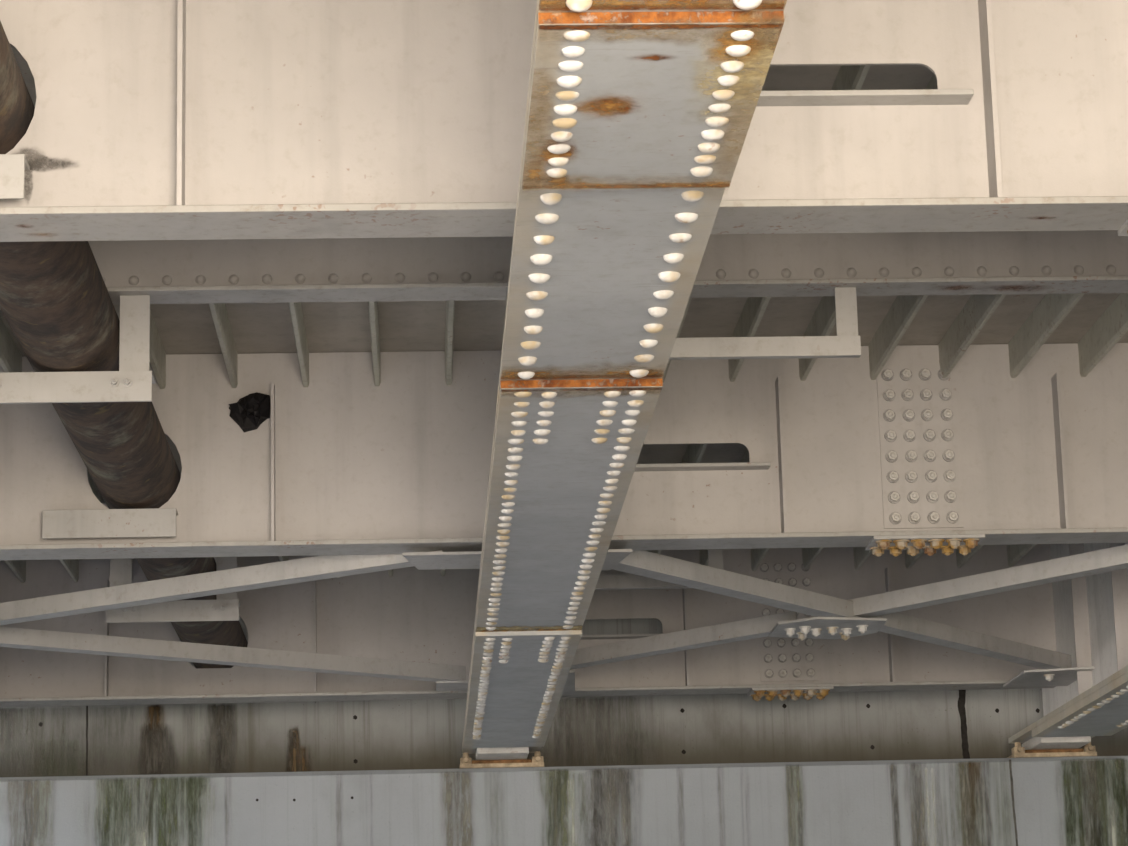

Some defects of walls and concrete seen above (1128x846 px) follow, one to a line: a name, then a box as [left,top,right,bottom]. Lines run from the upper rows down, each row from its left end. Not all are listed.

corrosion [538,0,784,158]
corrosion [523,73,730,189]
corrosion [501,366,663,395]
water stain [210,705,233,773]
crack [958,690,970,759]
water stain [98,778,202,846]
water stain [1063,760,1128,846]